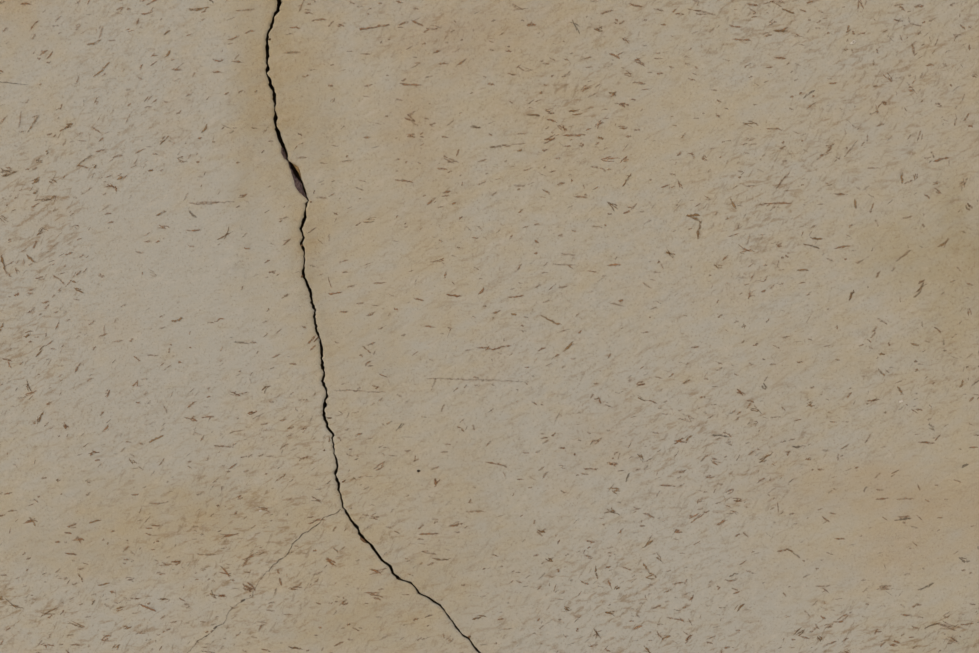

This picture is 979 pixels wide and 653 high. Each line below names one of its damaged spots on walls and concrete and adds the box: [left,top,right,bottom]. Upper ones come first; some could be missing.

crack [265,0,481,653]